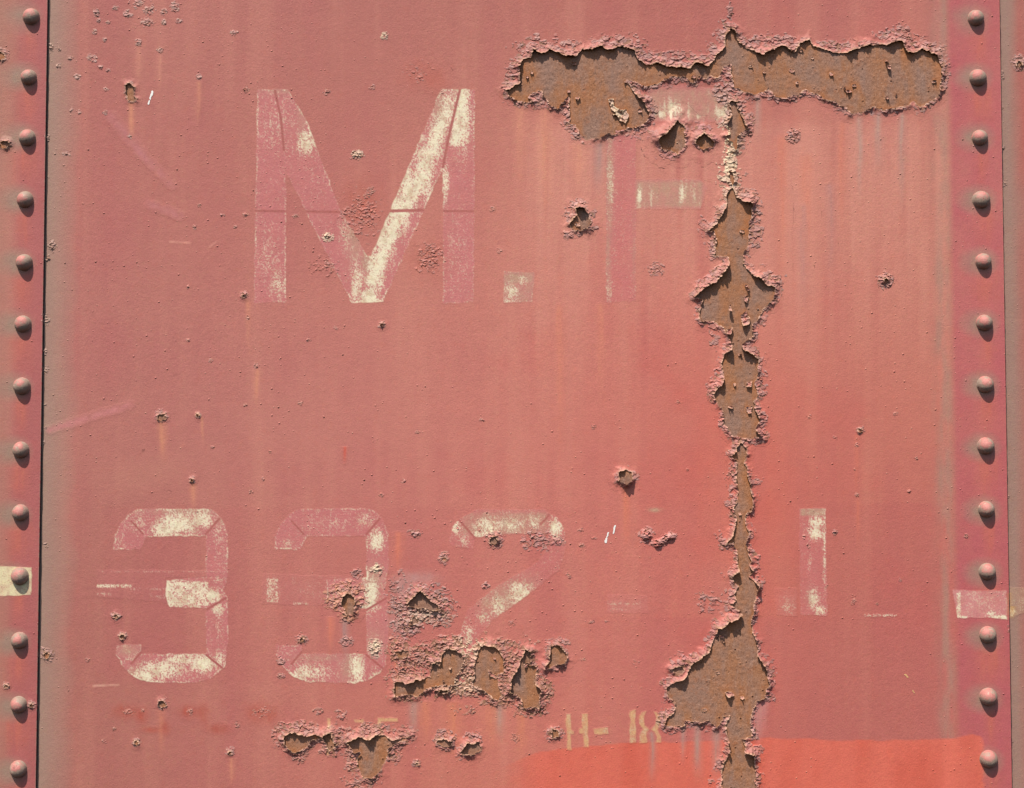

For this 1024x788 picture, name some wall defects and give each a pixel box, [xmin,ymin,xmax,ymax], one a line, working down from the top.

corrosion [506,106,589,230]
peeling [495,1,955,788]
peeling [322,562,579,744]
peeling [271,707,488,788]